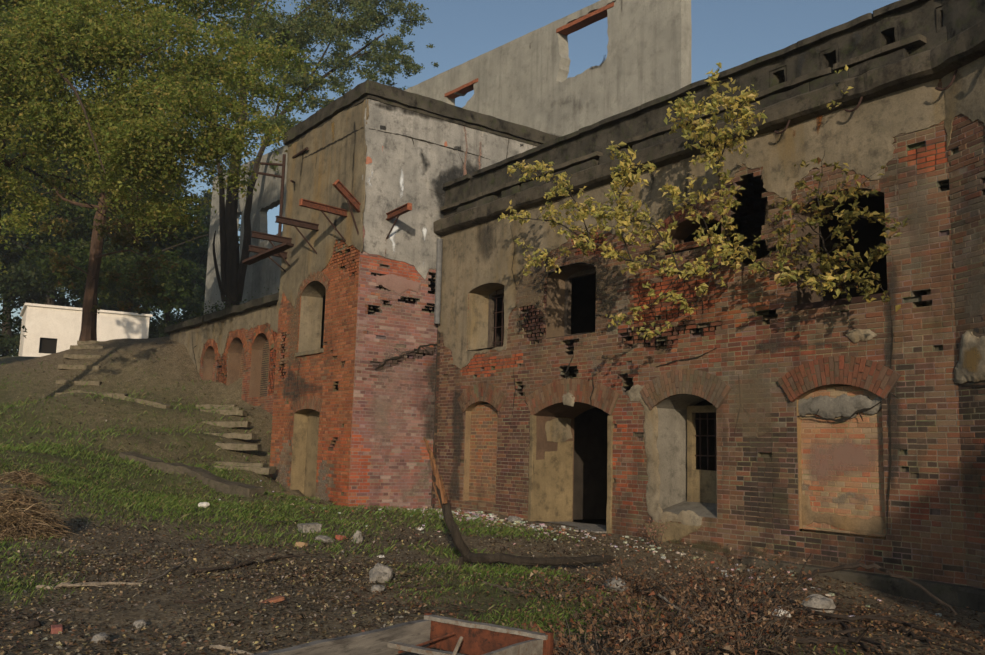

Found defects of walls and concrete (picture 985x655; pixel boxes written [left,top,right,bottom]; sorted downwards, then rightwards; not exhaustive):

crack [303,127,509,169]
damp [433,164,478,219]
spalling [898,141,949,192]
spalling [329,239,436,315]
spalling [519,284,547,344]
spalling [617,276,722,351]
spalling [755,309,777,325]
spalling [370,345,437,372]
crack [375,343,438,369]
spalling [454,353,523,378]